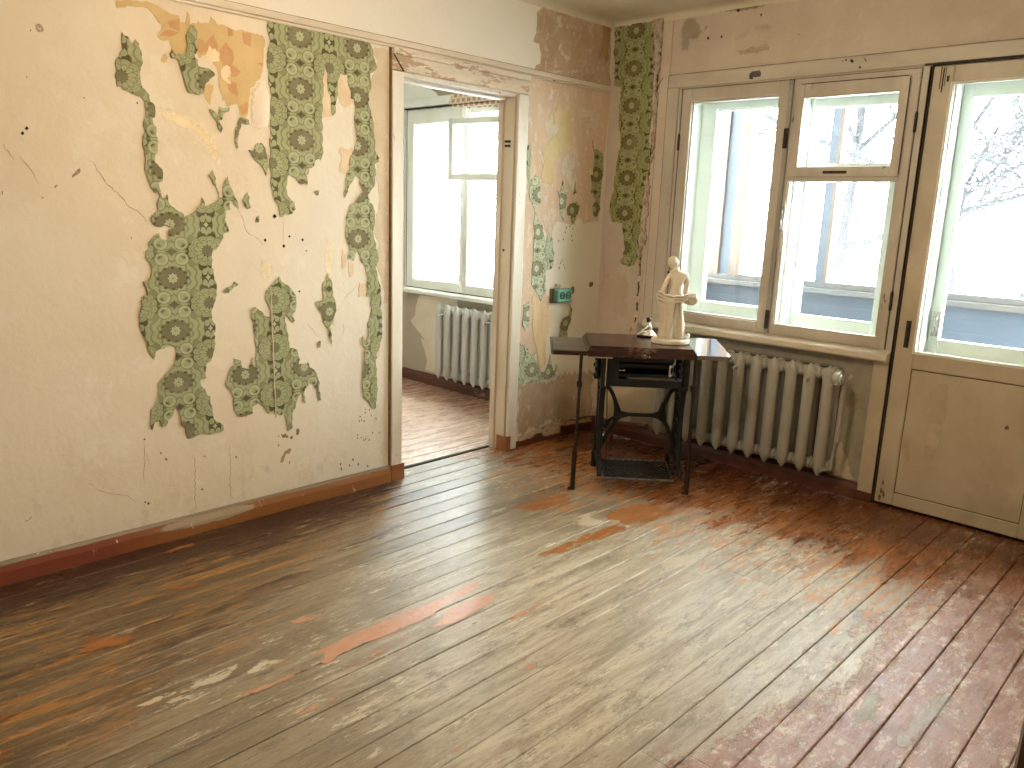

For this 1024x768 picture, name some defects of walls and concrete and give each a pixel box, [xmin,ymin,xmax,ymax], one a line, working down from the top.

flaking render [520,7,611,372]
peeling [637,18,664,276]
flaking render [518,387,655,442]